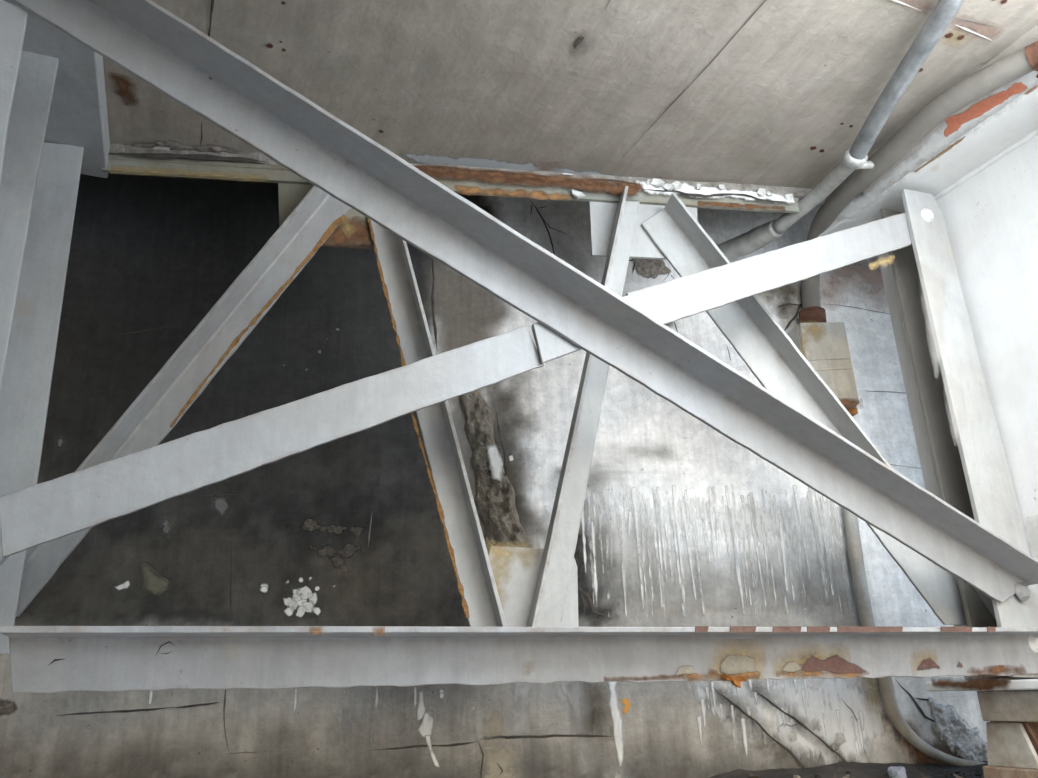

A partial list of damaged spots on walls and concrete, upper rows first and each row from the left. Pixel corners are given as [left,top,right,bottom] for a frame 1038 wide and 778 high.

crack [207,0,215,37]
rust [945,17,995,40]
rust [417,165,640,200]
leakage [574,485,853,622]
rust [786,653,866,674]
rust [917,658,940,670]
rust [958,662,1024,675]
spalling [928,698,988,762]
crack [376,734,608,778]